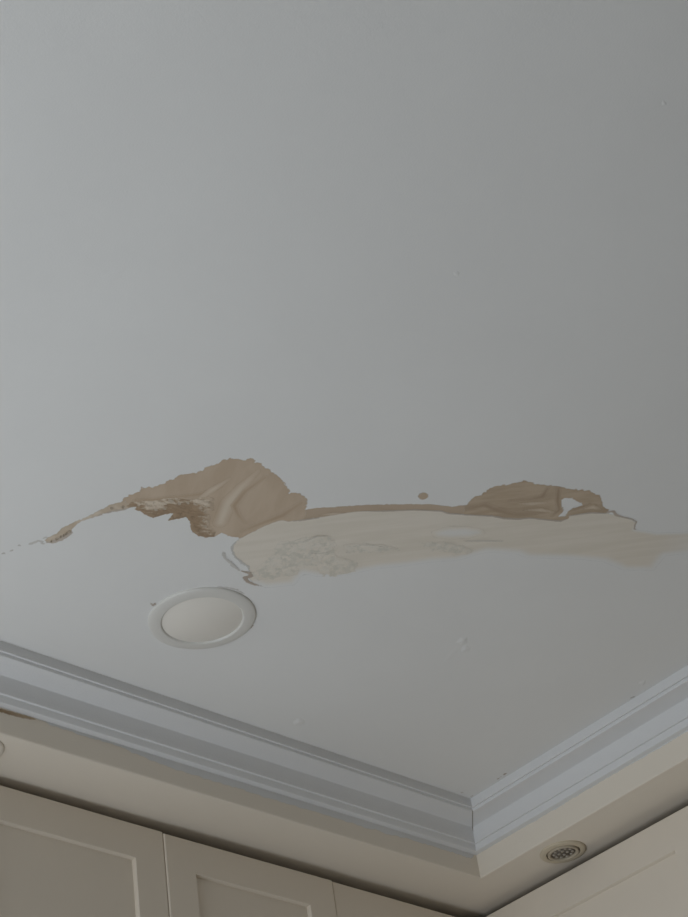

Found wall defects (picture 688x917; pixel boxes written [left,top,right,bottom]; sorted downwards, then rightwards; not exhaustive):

spalling [45,496,216,544]